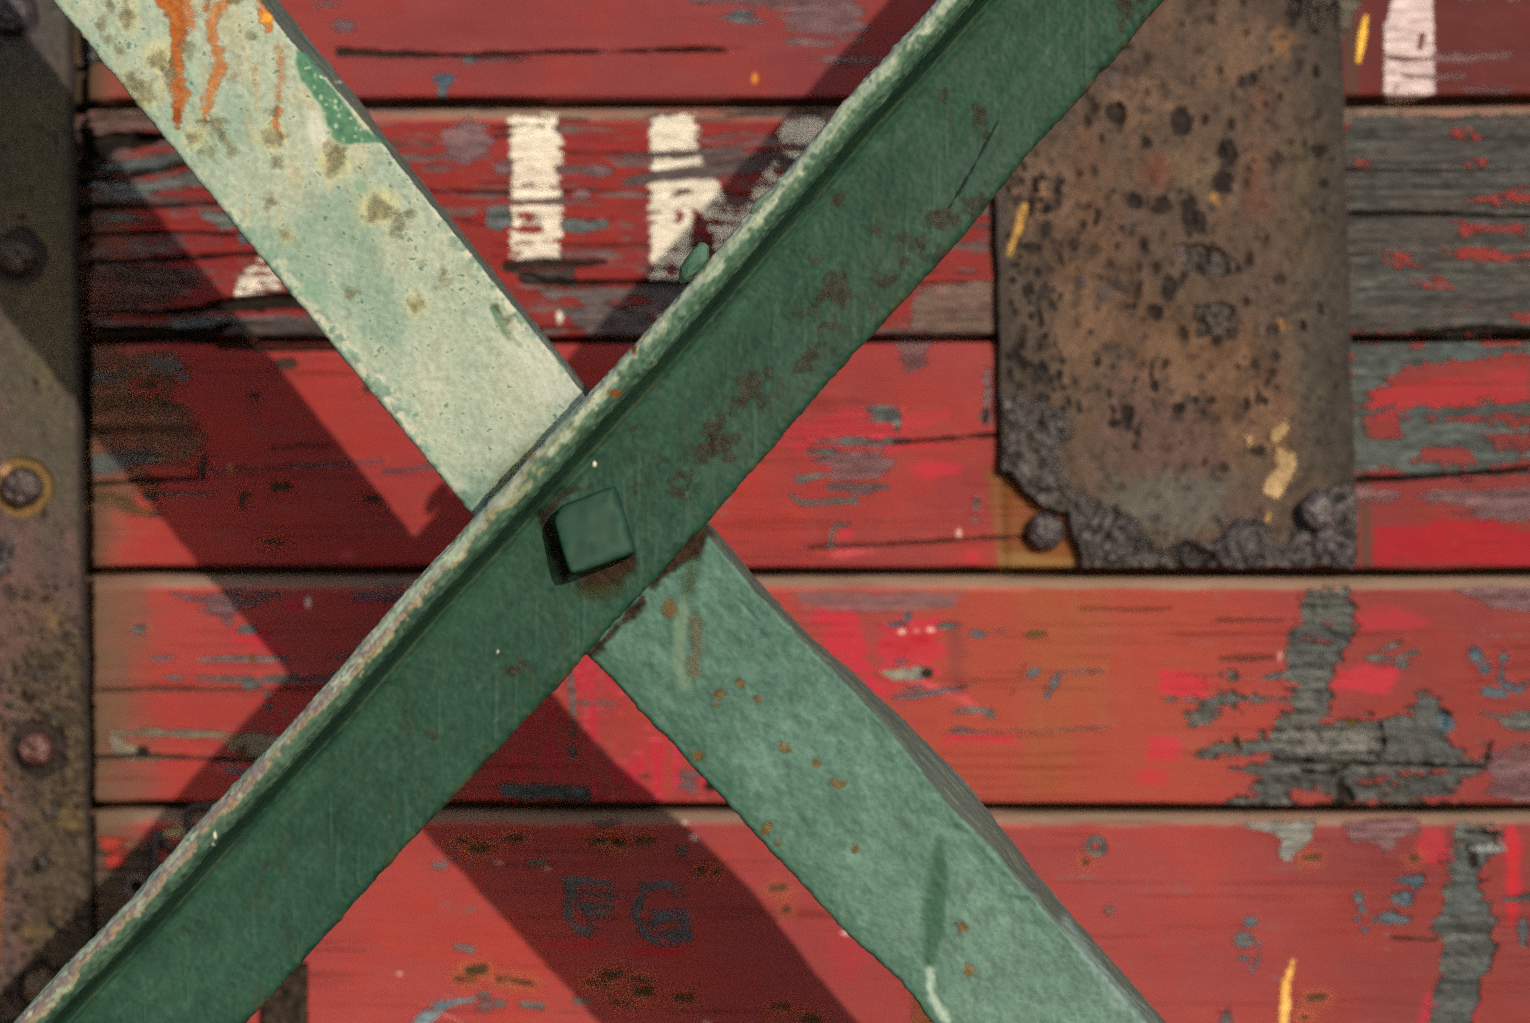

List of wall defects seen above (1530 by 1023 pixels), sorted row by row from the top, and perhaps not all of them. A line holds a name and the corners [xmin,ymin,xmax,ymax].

rust [156,0,232,123]
rust [257,0,273,33]
peeling [689,0,881,64]
rust [1289,0,1341,33]
peeling [1432,52,1511,93]
crack [79,203,259,268]
rust [1174,243,1240,277]
peeling [1344,111,1530,521]
rust [1001,396,1358,569]
rust [0,538,15,578]
peeling [1164,586,1530,1023]